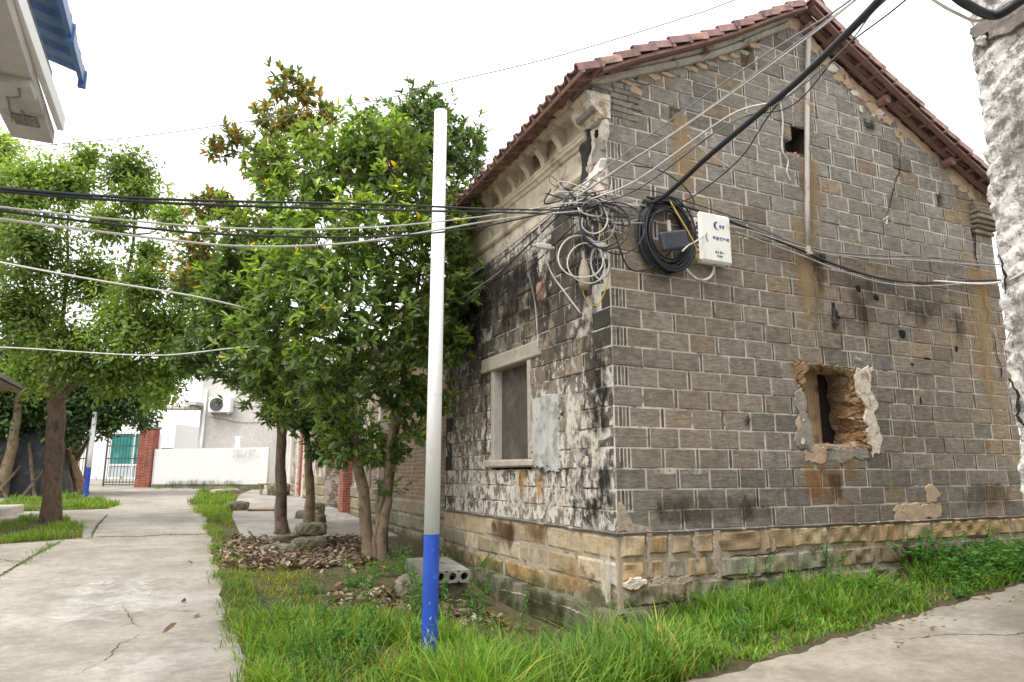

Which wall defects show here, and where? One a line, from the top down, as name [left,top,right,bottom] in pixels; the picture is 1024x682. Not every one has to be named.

spalling [811,41,903,146]
flaking render [579,119,610,199]
crack [884,143,904,218]
water stain [571,220,601,304]
crack [974,230,1008,294]
water stain [460,251,553,410]
peeling [531,388,600,509]
water stain [572,458,611,522]
water stain [591,345,607,436]
spalling [791,357,883,465]
peeling [893,484,942,520]
crack [991,331,1024,426]